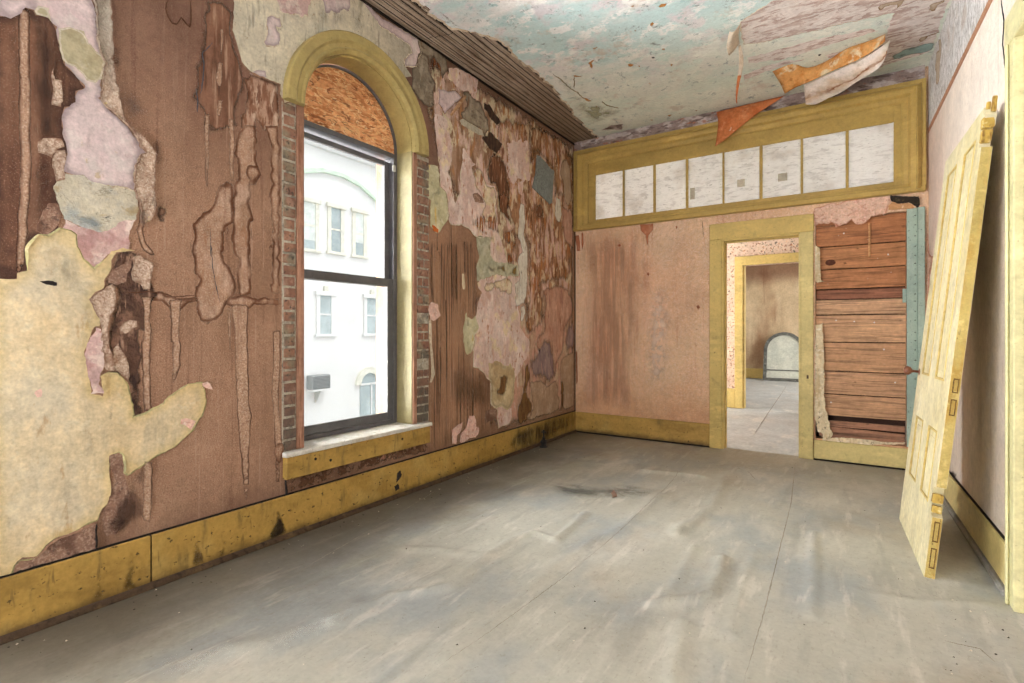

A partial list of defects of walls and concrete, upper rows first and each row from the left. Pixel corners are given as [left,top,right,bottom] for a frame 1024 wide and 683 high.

peeling [0,0,146,191]
peeling [0,220,213,576]
peeling [452,416,479,444]
peeling [417,68,572,429]